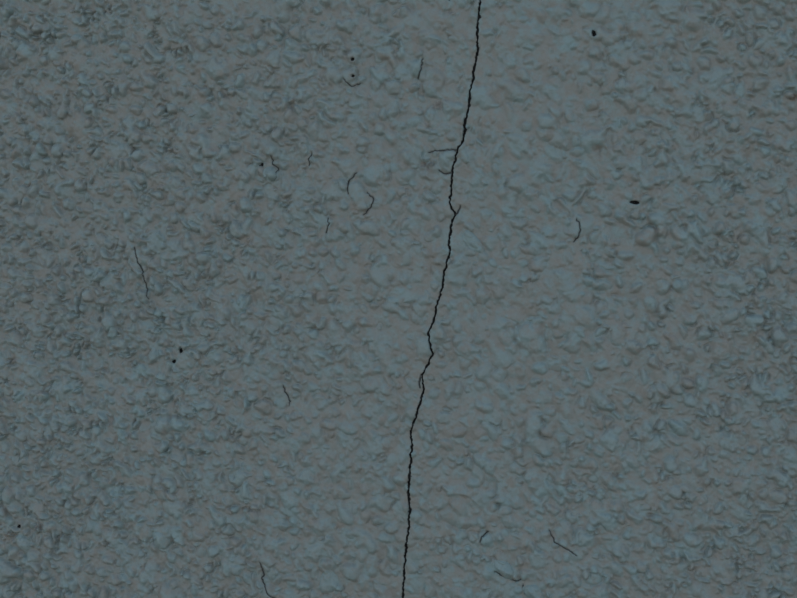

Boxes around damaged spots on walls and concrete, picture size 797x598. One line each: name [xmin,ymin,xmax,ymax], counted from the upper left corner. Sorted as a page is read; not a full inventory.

crack [402,0,481,598]